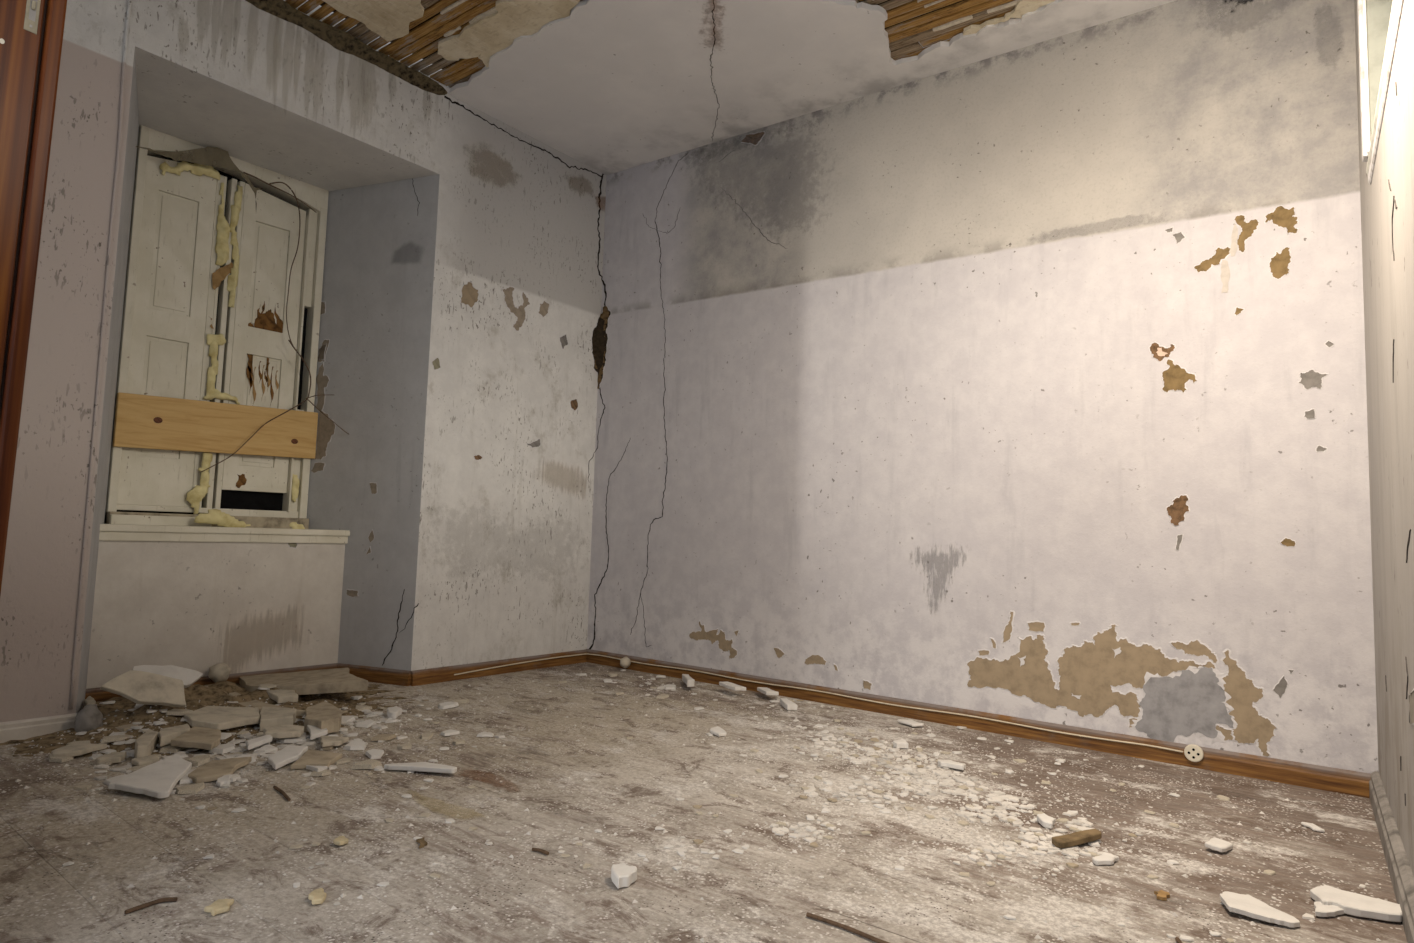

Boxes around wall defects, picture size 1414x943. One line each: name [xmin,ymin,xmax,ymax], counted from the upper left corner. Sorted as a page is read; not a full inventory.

flaking render [285,0,582,88]
flaking render [855,0,1055,60]
peeling [460,281,479,308]
peeling [500,286,550,331]
crack [444,96,607,306]
crack [630,0,784,647]
peeling [1149,342,1198,393]
peeling [1193,205,1299,316]
peeling [1388,179,1397,261]
crack [588,388,630,649]
peeling [689,620,739,660]
peeling [966,610,1295,757]